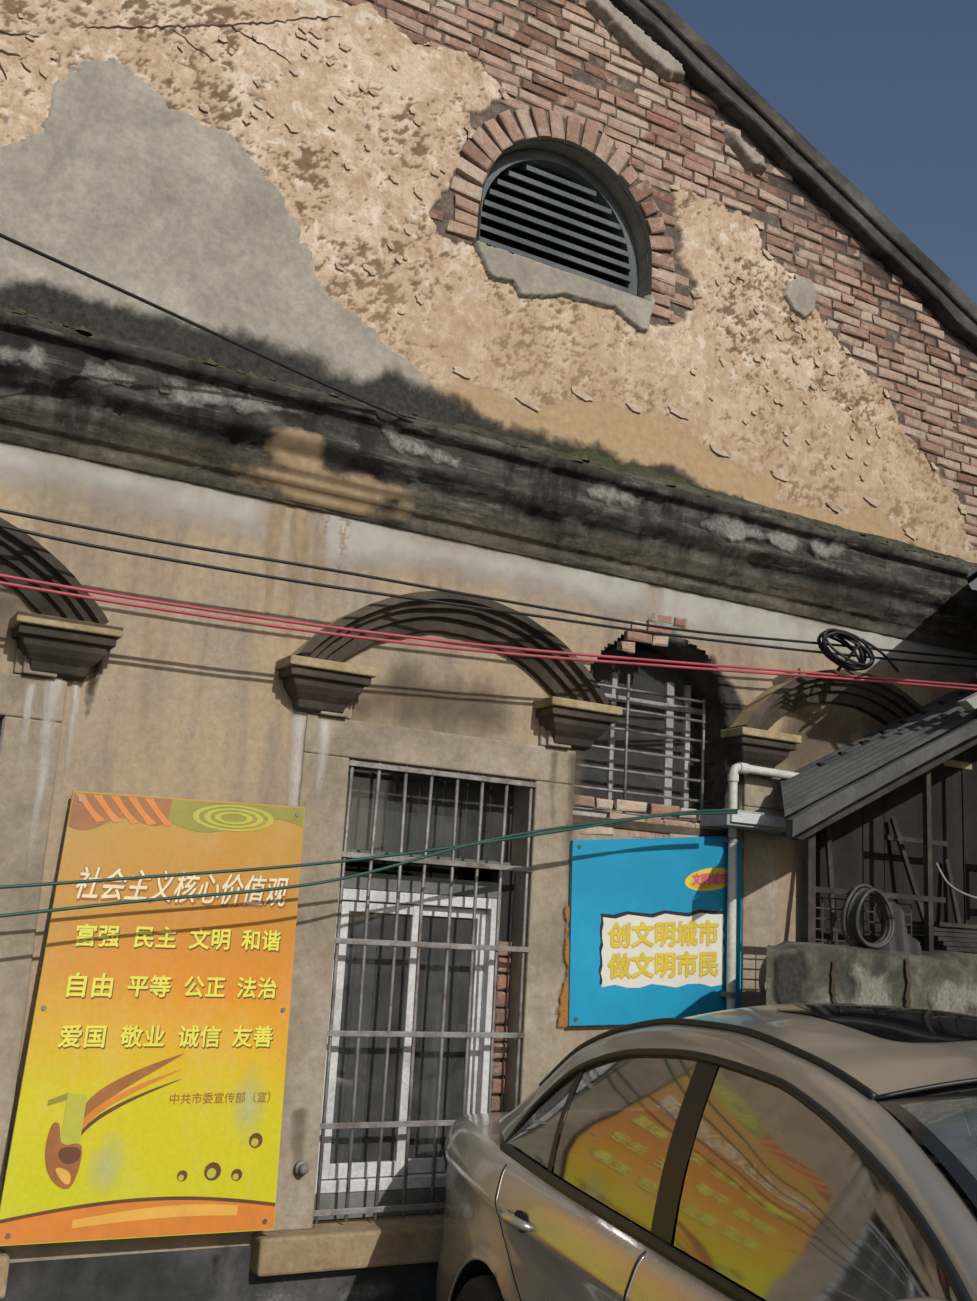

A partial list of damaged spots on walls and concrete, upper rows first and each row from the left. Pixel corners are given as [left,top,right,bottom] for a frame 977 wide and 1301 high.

crack [0,30,39,79]
crack [85,16,342,64]
flaking render [289,24,352,76]
flaking render [343,0,977,550]
peeling [0,346,44,366]
peeling [85,366,133,384]
peeling [172,380,275,412]
damp [0,280,757,505]
damp [0,444,262,526]
damp [0,517,109,624]
flaking render [617,612,687,654]
damp [25,659,102,734]